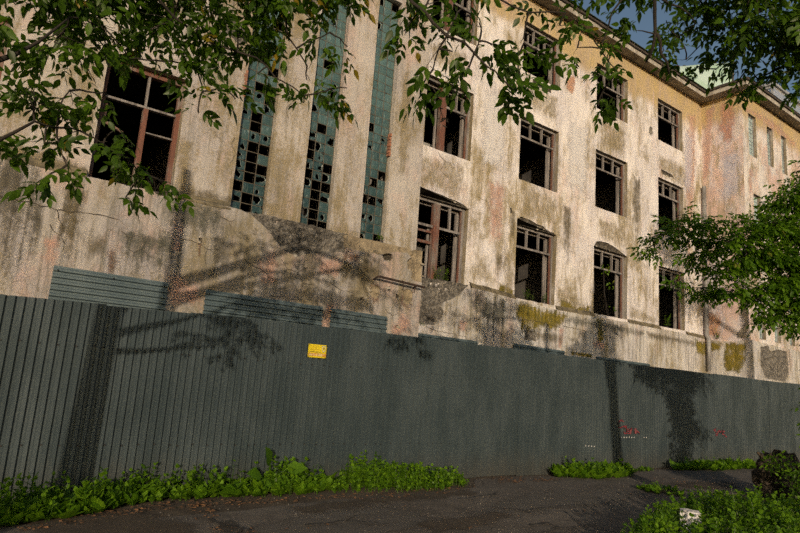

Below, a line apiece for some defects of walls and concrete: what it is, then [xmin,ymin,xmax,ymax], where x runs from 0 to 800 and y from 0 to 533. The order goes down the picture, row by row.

leakage [60,181,83,238]
flaking render [247,205,468,325]
flaking render [760,346,788,382]